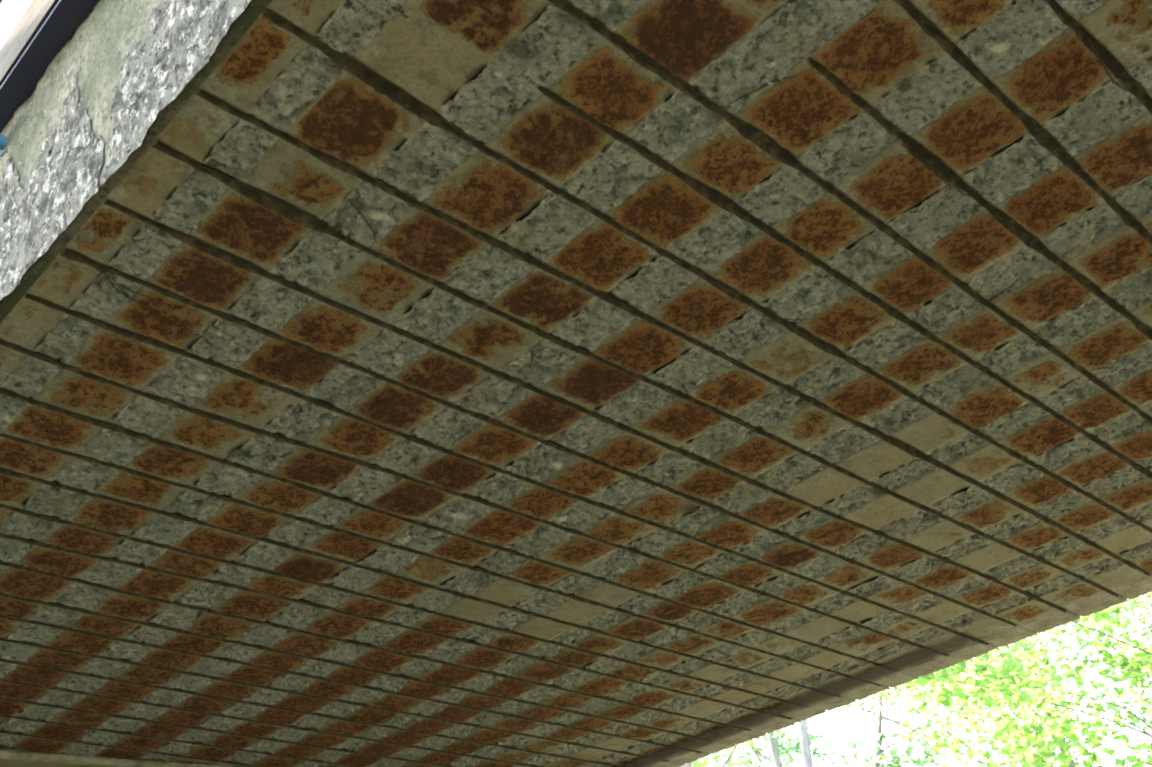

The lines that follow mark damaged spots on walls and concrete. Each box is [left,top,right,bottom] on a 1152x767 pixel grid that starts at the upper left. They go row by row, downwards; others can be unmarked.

rust [215,17,289,88]
rust [296,77,410,167]
rust [420,0,533,53]
rust [745,8,935,152]
rust [929,0,1006,34]
rust [919,32,1111,172]
rust [1107,0,1152,53]
rust [803,124,1152,347]
rust [0,130,942,767]
rust [513,224,1152,584]
rust [879,565,970,605]
rust [1000,584,1098,622]